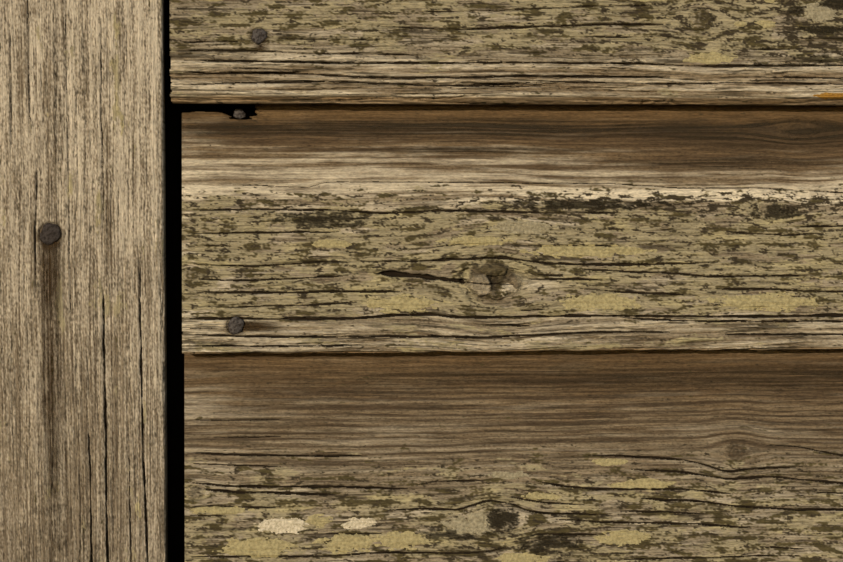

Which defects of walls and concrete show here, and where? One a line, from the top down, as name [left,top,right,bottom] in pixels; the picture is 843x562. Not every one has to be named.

crack [242,180,349,188]
crack [408,181,842,193]
crack [187,208,843,348]
crack [190,419,843,536]
crack [195,532,506,558]
crack [624,546,803,560]